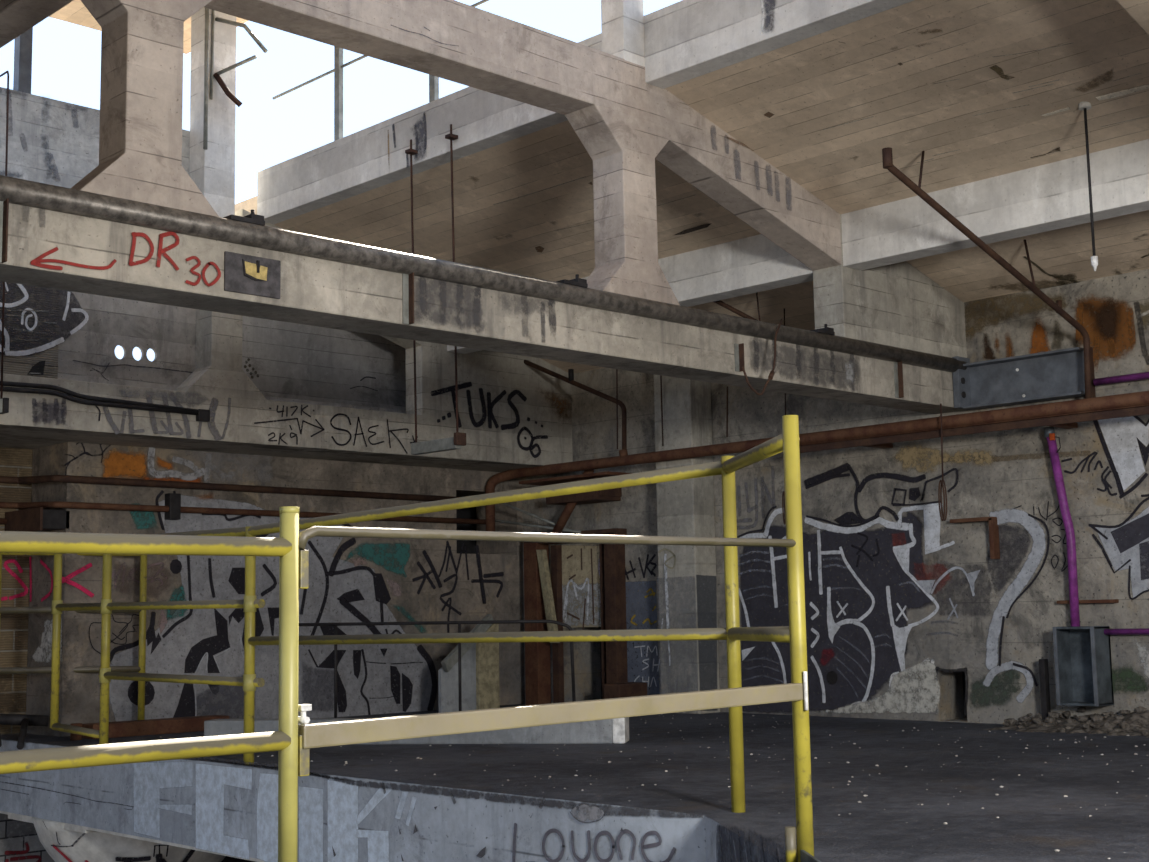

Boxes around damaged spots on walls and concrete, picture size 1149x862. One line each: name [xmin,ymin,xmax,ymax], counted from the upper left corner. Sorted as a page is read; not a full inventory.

water stain [711,126,748,179]
water stain [755,161,792,209]
water stain [416,277,483,328]
water stain [541,300,556,342]
corrosion [984,334,1014,360]
corrosion [1030,298,1136,366]
peeling [1136,642,1149,677]
peeling [815,658,968,715]